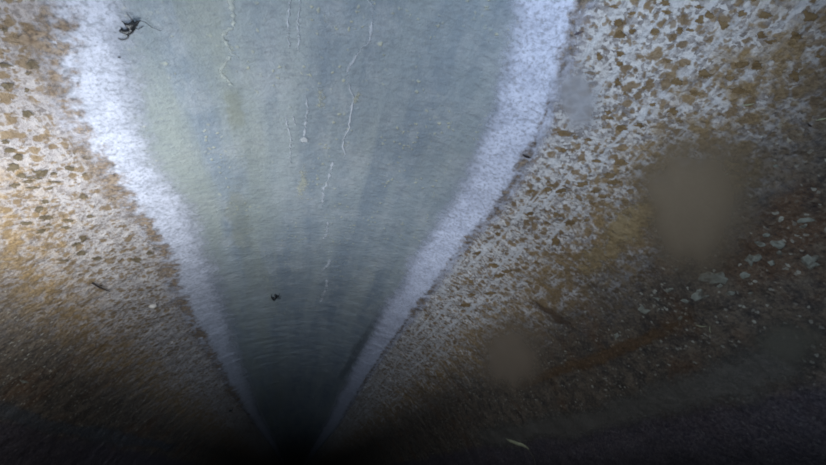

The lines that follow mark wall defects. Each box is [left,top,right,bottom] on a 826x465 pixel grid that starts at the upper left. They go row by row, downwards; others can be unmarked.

crack [322,88,354,202]
peeling [740,233,785,279]
peeling [801,254,820,270]
peeling [681,272,735,303]